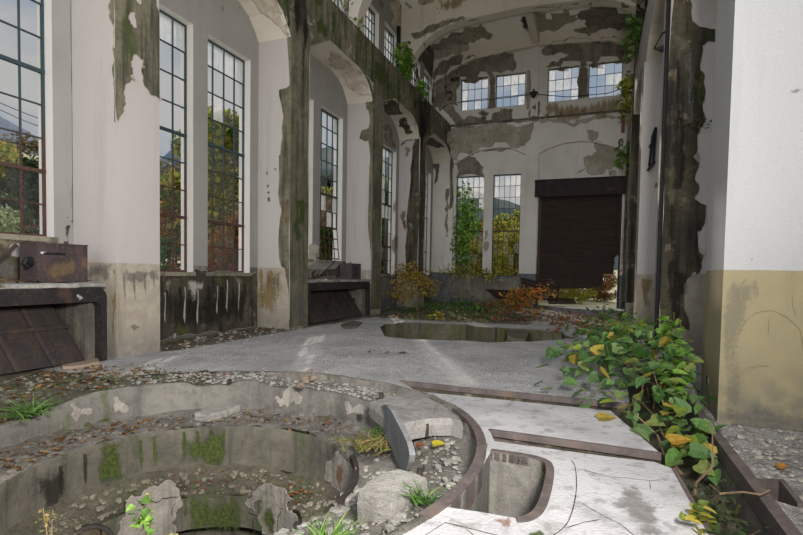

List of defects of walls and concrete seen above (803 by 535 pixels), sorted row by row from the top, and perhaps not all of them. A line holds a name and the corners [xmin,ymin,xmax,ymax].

peeling [108,0,162,122]
damp [164,280,247,327]
peeling [252,0,346,328]
peeling [359,0,648,310]
peeling [660,0,716,331]
crack [553,460,651,535]